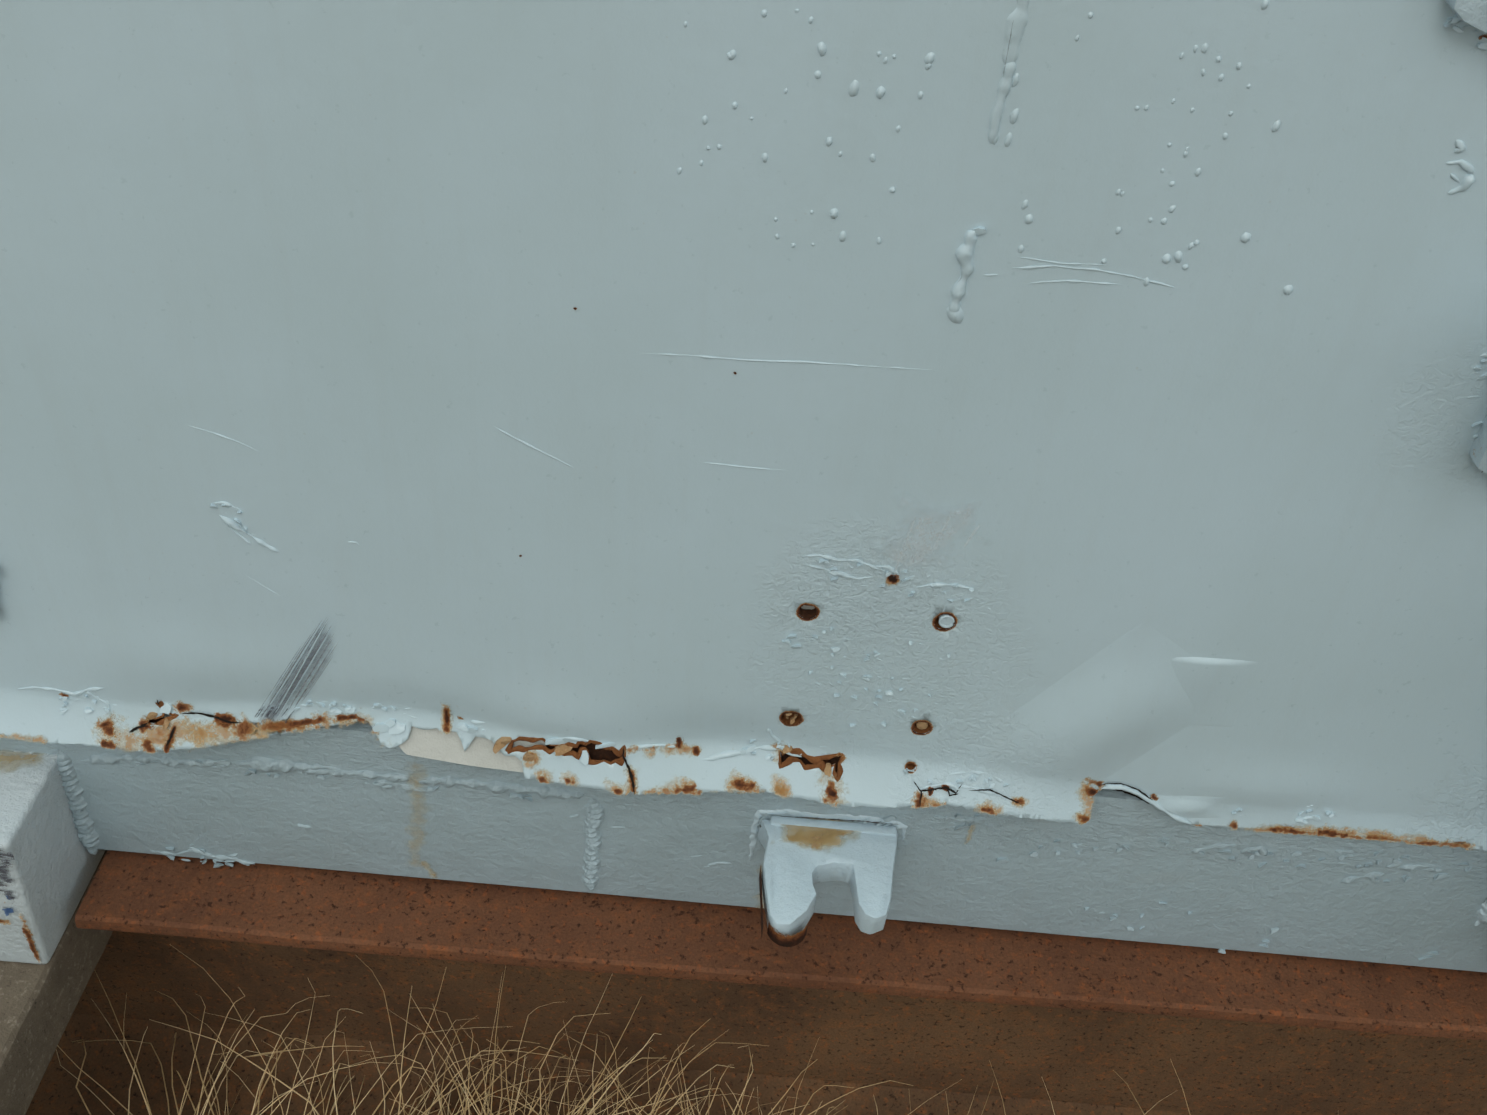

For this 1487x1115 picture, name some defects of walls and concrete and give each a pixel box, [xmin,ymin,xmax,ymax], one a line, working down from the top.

corrosion [932,612,957,632]
corrosion [97,700,377,753]
peeling [294,700,417,734]
peeling [456,720,512,754]
peeling [523,737,676,766]
corrosion [612,737,702,795]
corrosion [727,777,791,797]
peeling [702,728,832,777]
corrosion [786,777,853,849]
corrosion [1077,778,1159,824]
corrosion [1229,821,1475,850]
corrosion [0,916,40,962]